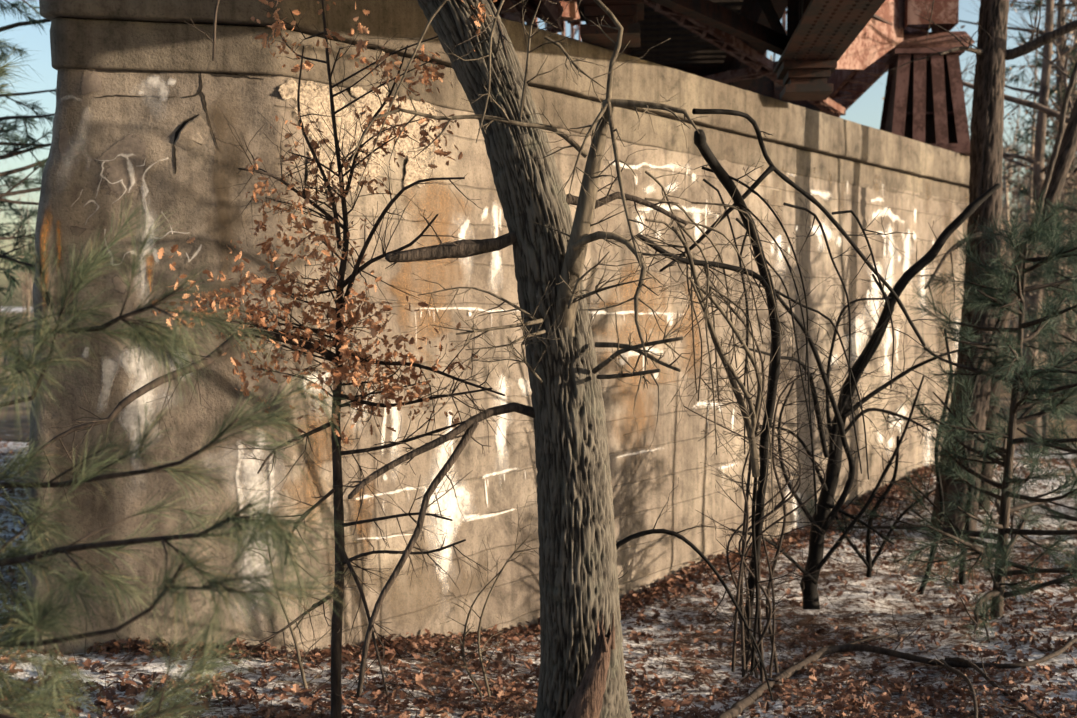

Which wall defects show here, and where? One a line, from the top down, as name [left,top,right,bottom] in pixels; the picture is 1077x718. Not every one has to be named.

crack [72,72,261,266]